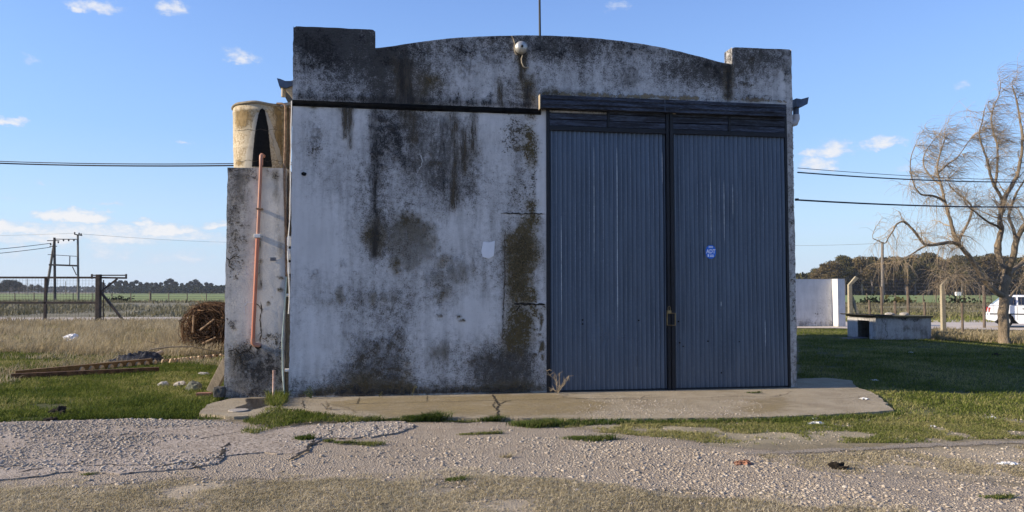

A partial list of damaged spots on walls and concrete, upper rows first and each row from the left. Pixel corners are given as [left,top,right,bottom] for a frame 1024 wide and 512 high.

damp [296,36,772,273]
damp [226,333,284,410]
damp [298,323,547,396]